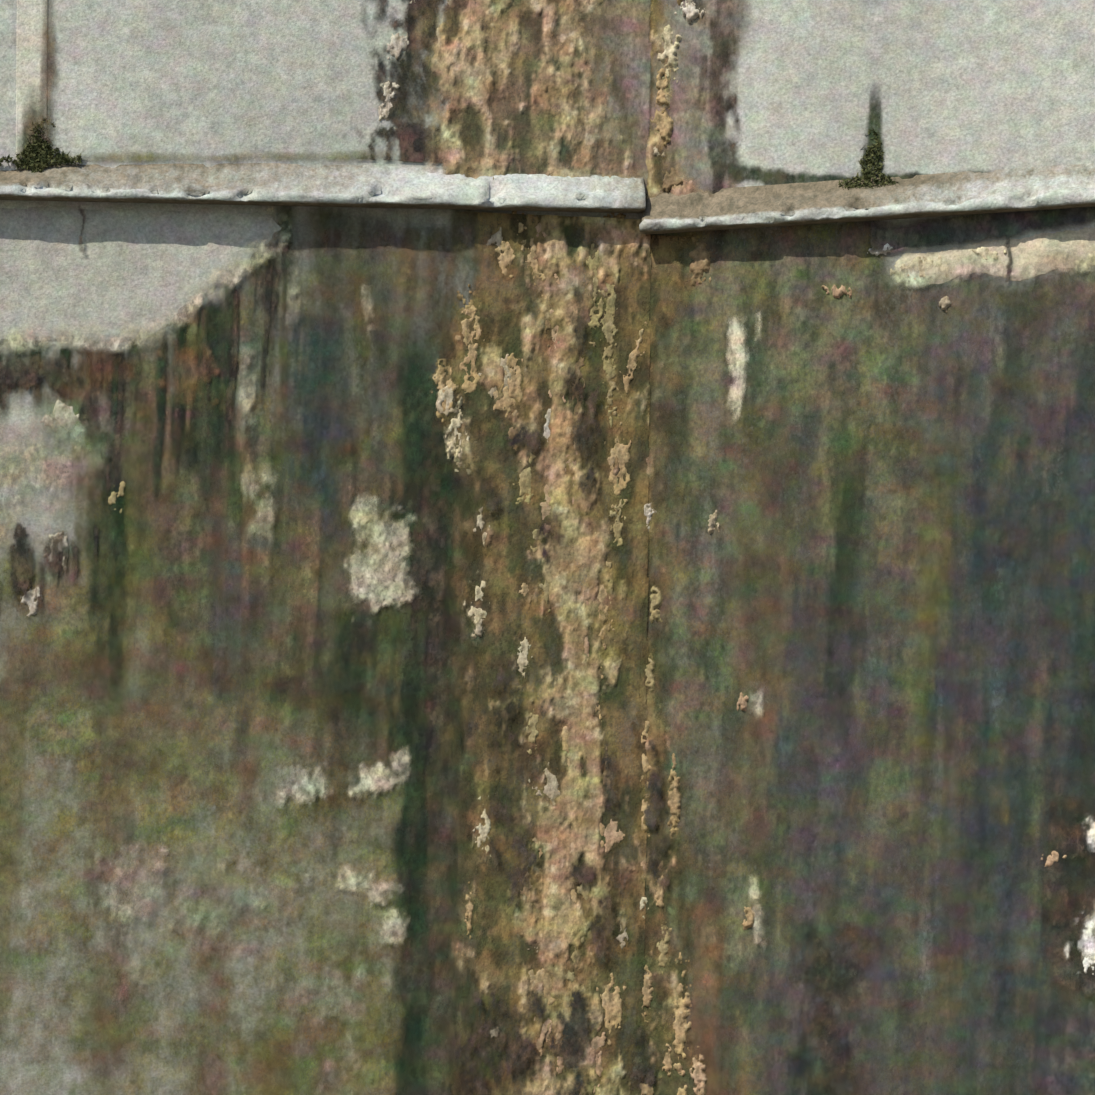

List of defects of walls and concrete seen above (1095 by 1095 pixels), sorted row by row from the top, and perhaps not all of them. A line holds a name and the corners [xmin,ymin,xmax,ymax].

damp [21,27,55,169]
damp [96,153,167,161]
peeling [378,80,400,130]
peeling [425,0,706,201]
damp [649,0,923,194]
peeling [867,207,1095,312]
crack [1004,237,1012,283]
damp [0,206,490,1095]
peeling [431,211,711,1095]
damp [647,220,1095,1095]
spalling [1041,818,1095,867]
spalling [1064,911,1095,998]